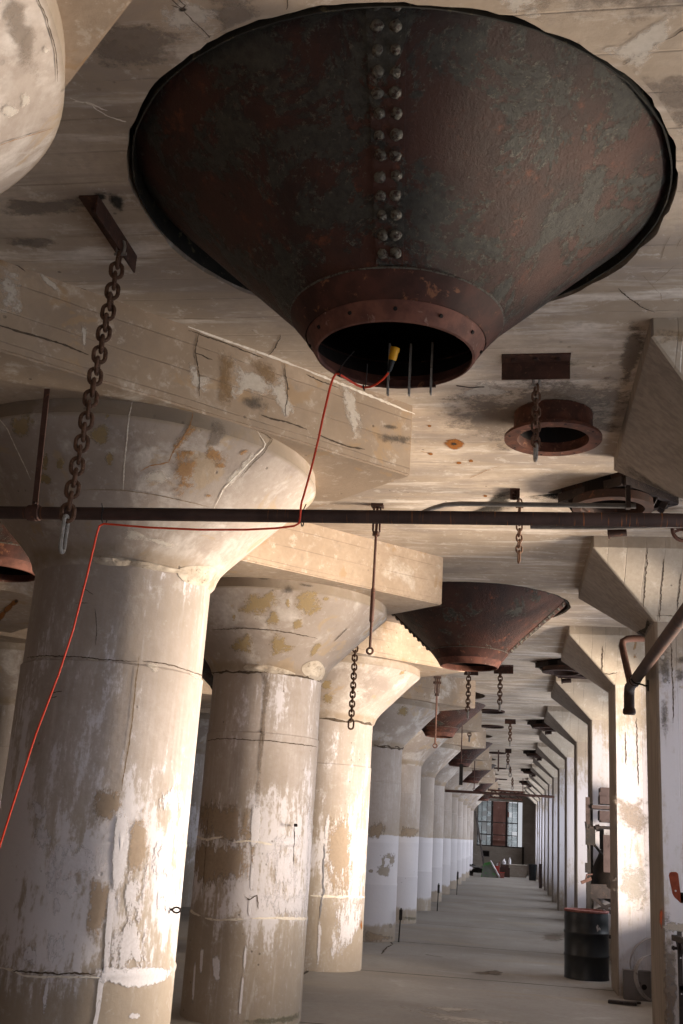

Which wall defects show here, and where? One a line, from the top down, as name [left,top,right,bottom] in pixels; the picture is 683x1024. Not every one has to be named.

damp [98,0,253,66]
damp [577,0,669,66]
crack [140,330,340,472]
peeling [232,591,328,655]
peeling [94,790,122,820]
peeling [87,810,175,973]
peeling [194,800,255,887]
peeling [369,853,395,877]
crack [12,968,95,976]